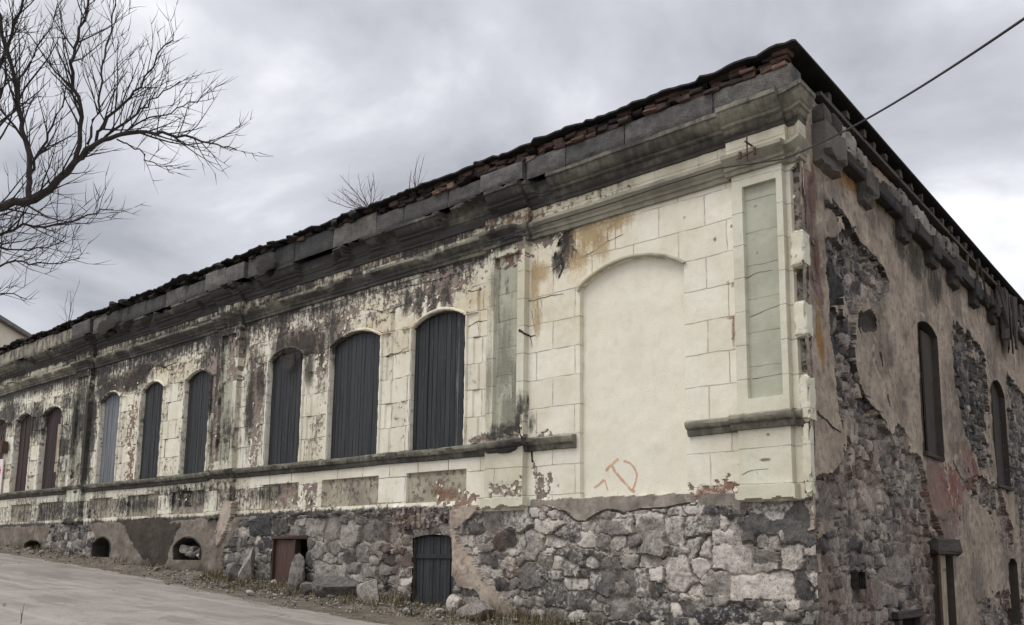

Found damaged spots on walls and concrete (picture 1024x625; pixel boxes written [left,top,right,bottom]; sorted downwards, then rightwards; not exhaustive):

leakage [531,216,627,296]
spalling [881,181,969,274]
flaking render [858,309,878,334]
flaking render [115,367,142,480]
peeling [204,306,359,470]
leakage [487,419,533,440]
crack [817,411,842,433]
spalling [388,461,553,530]
spalling [850,572,866,589]